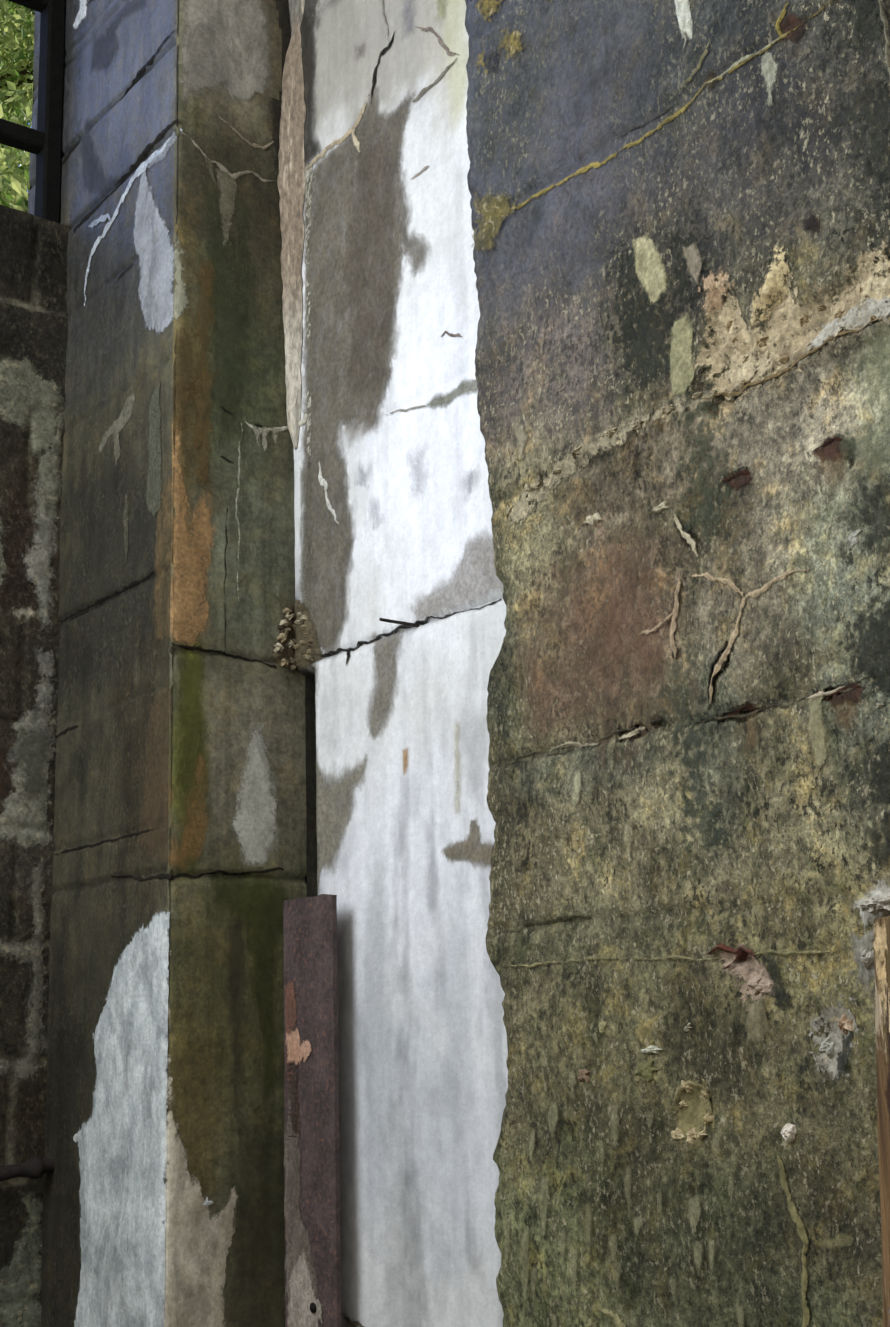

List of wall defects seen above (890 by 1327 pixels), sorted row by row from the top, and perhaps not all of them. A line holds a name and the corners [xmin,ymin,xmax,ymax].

crack [73,0,458,306]
crack [507,1,832,210]
peeling [878,0,890,76]
rust [154,261,215,647]
spalling [505,241,890,529]
crack [321,599,501,665]
crack [639,514,878,767]
peeling [73,911,238,1327]
peeling [0,1191,43,1327]